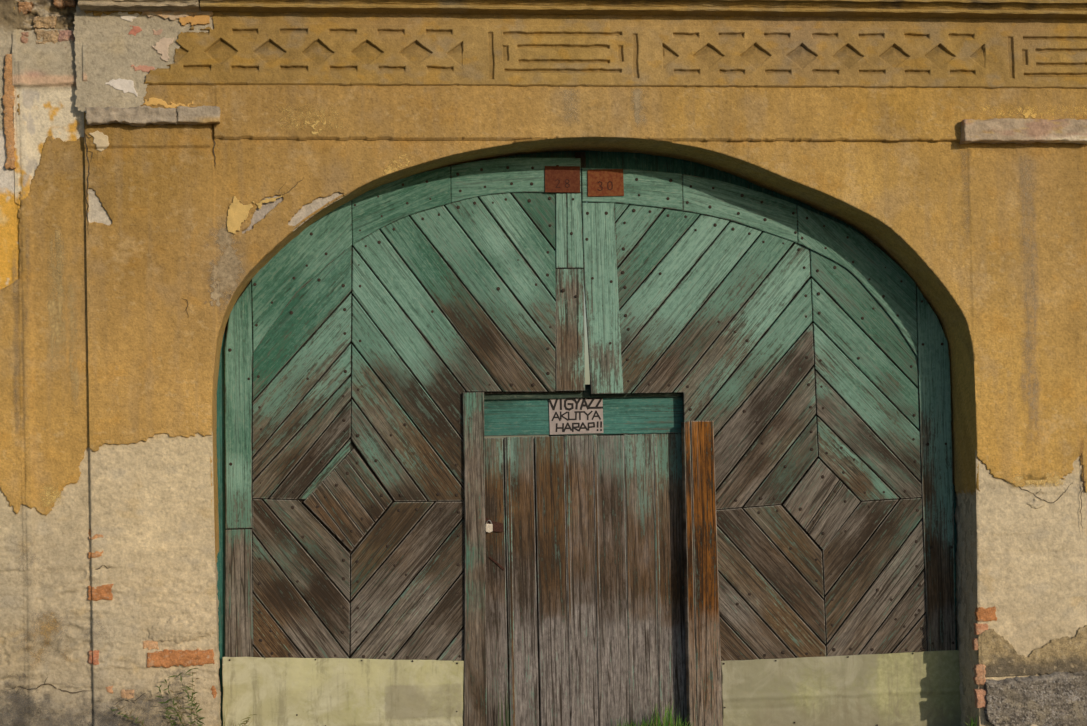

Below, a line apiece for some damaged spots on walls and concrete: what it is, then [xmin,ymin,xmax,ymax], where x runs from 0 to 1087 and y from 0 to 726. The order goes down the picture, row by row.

spalling [0,0,214,289]
spalling [227,195,283,234]
spalling [288,192,344,231]
crack [1018,453,1086,532]
spalling [0,432,219,726]
spalling [972,456,1087,657]
water stain [977,625,1087,677]
crack [5,677,92,693]
spalling [973,664,1046,726]